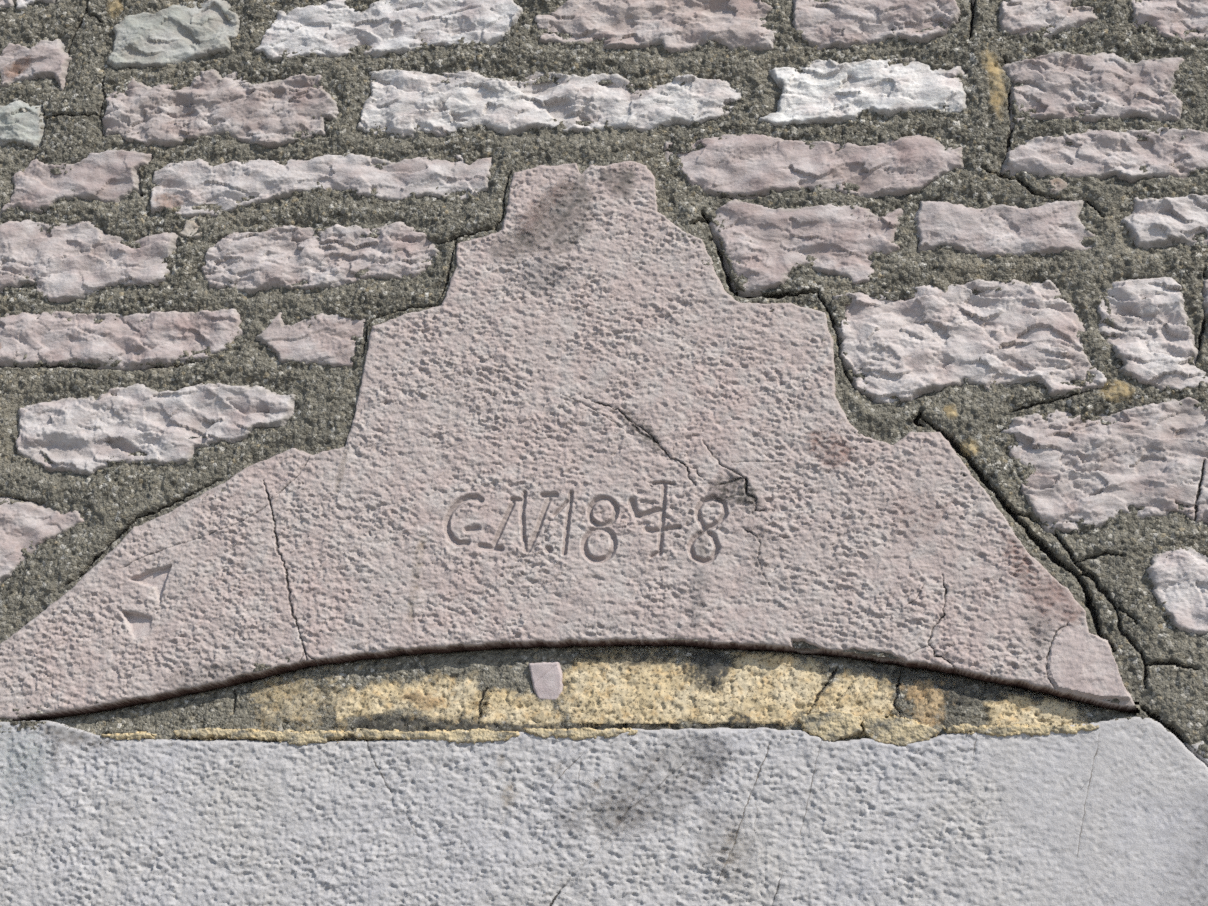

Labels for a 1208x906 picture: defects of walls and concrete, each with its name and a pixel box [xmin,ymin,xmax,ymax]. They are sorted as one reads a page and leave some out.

crack [569,397,781,556]
crack [263,480,319,666]
crack [910,413,1195,743]
spalling [1050,625,1128,697]
peeling [101,731,157,741]
peeling [173,727,638,746]
peeling [797,709,1099,746]